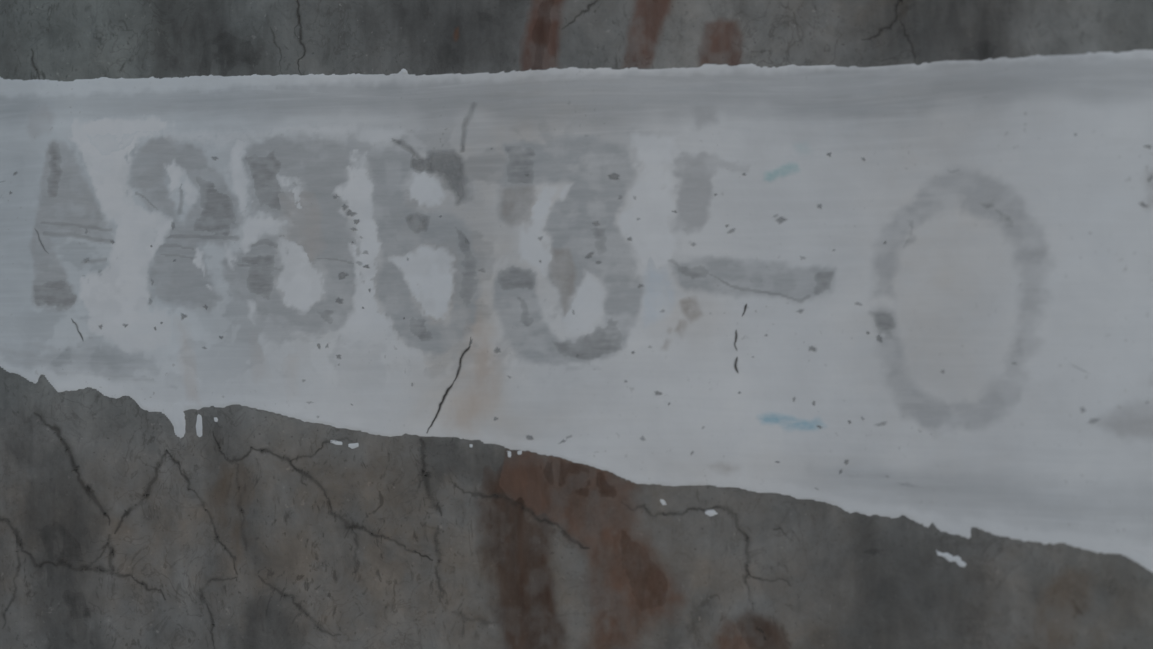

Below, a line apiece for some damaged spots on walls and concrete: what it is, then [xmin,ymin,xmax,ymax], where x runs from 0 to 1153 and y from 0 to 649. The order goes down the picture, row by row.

corrosion [518,0,571,71]
corrosion [620,0,677,69]
corrosion [694,14,746,68]
crack [427,337,471,433]
corrosion [470,448,692,649]